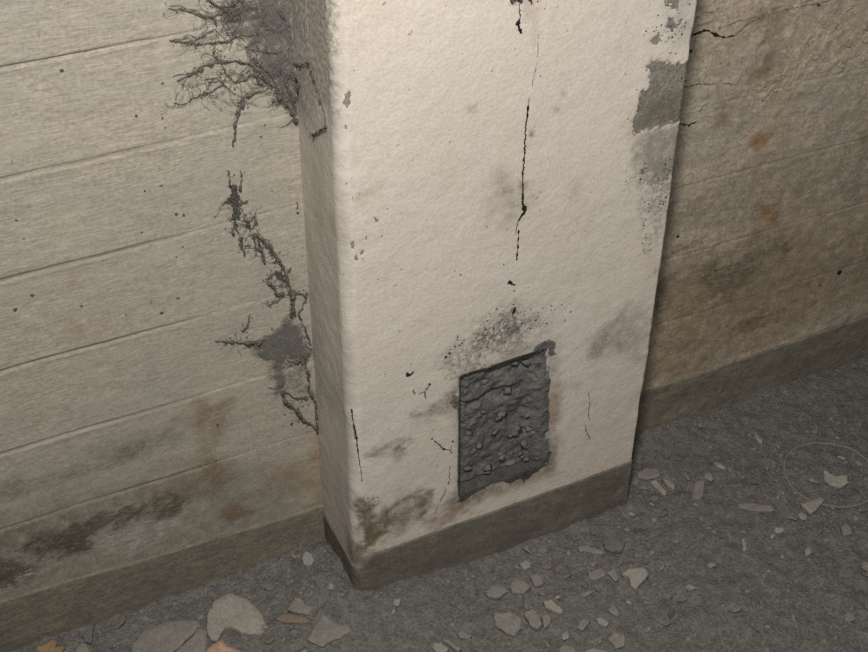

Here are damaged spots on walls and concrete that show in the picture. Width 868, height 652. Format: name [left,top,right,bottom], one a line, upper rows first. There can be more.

crack [679,0,829,127]
crack [514,35,539,260]
peeling [632,0,697,254]
spalling [445,303,572,373]
spalling [504,451,552,484]
water stain [0,493,185,589]
water stain [349,491,431,564]